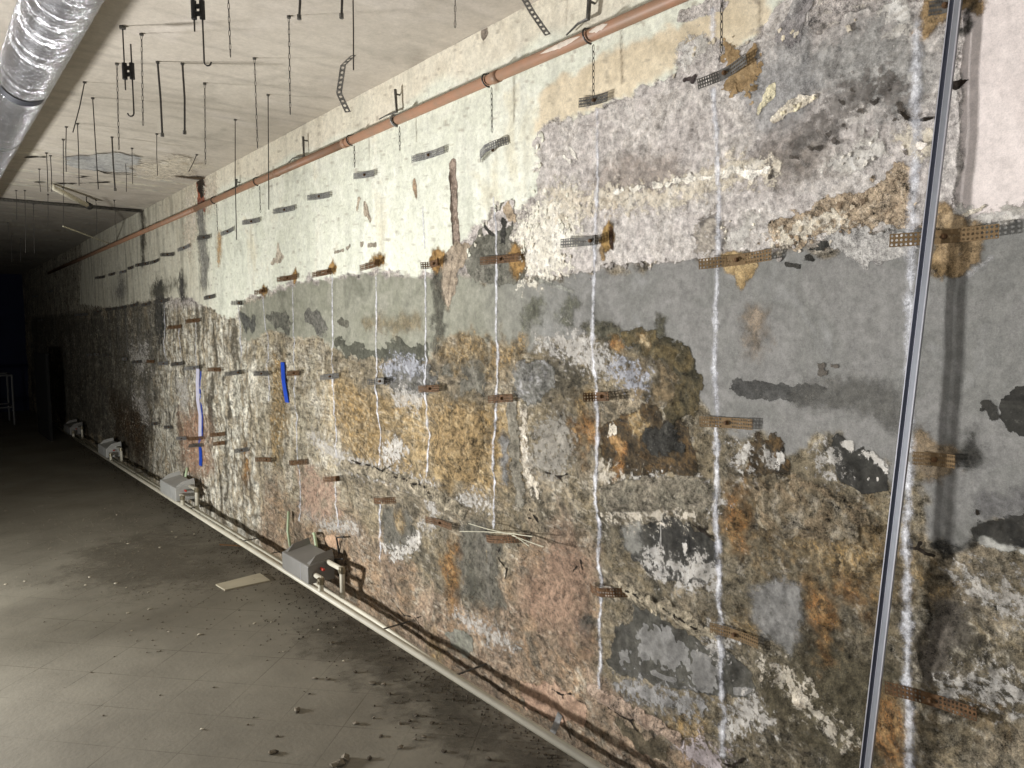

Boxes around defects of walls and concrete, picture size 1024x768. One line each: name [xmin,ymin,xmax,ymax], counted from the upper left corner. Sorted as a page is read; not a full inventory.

rust [720,38,764,105]
flaking render [440,0,944,307]
flaking render [939,64,1024,230]
rust [429,247,445,274]
rust [598,220,615,261]
rust [931,202,983,279]
water stain [509,147,790,598]
water stain [980,386,1024,437]
flaking render [499,398,542,508]
water stain [805,433,890,494]
water stain [914,488,1024,725]
flaking render [520,681,588,727]